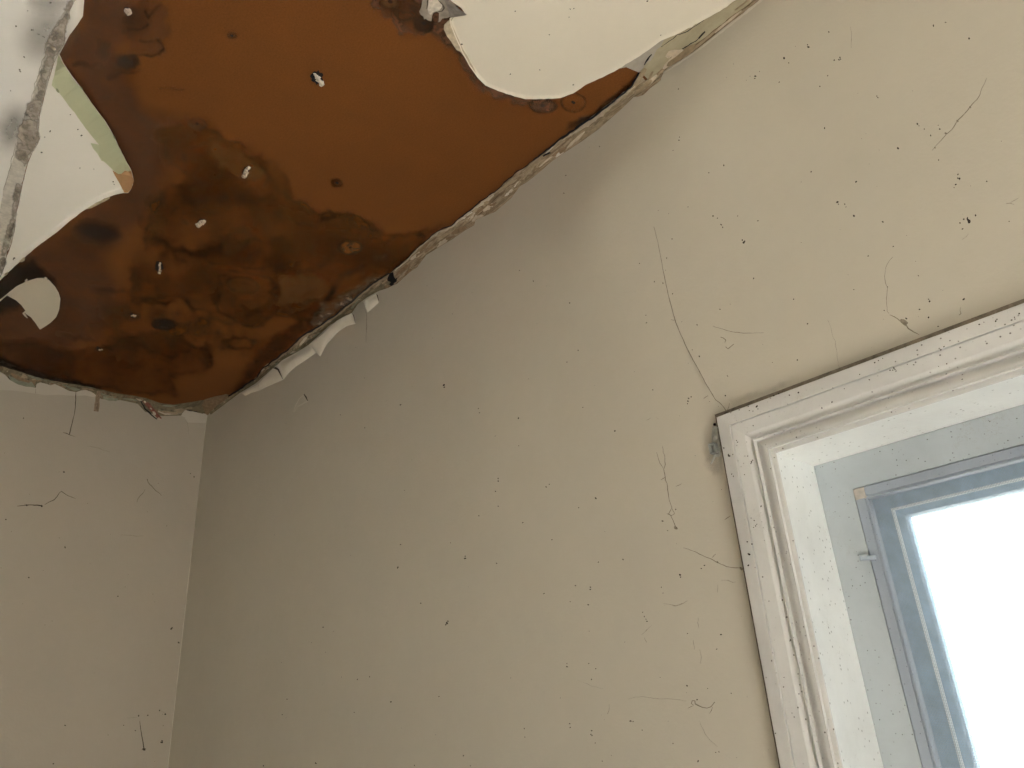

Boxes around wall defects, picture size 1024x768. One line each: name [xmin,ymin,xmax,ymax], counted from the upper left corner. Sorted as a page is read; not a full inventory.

peeling [0,0,134,280]
leakage [0,0,425,396]
peeling [444,0,735,99]
crack [934,78,987,148]
peeling [0,277,60,329]
peeling [0,373,96,397]
crack [654,228,730,411]
crack [656,446,743,592]